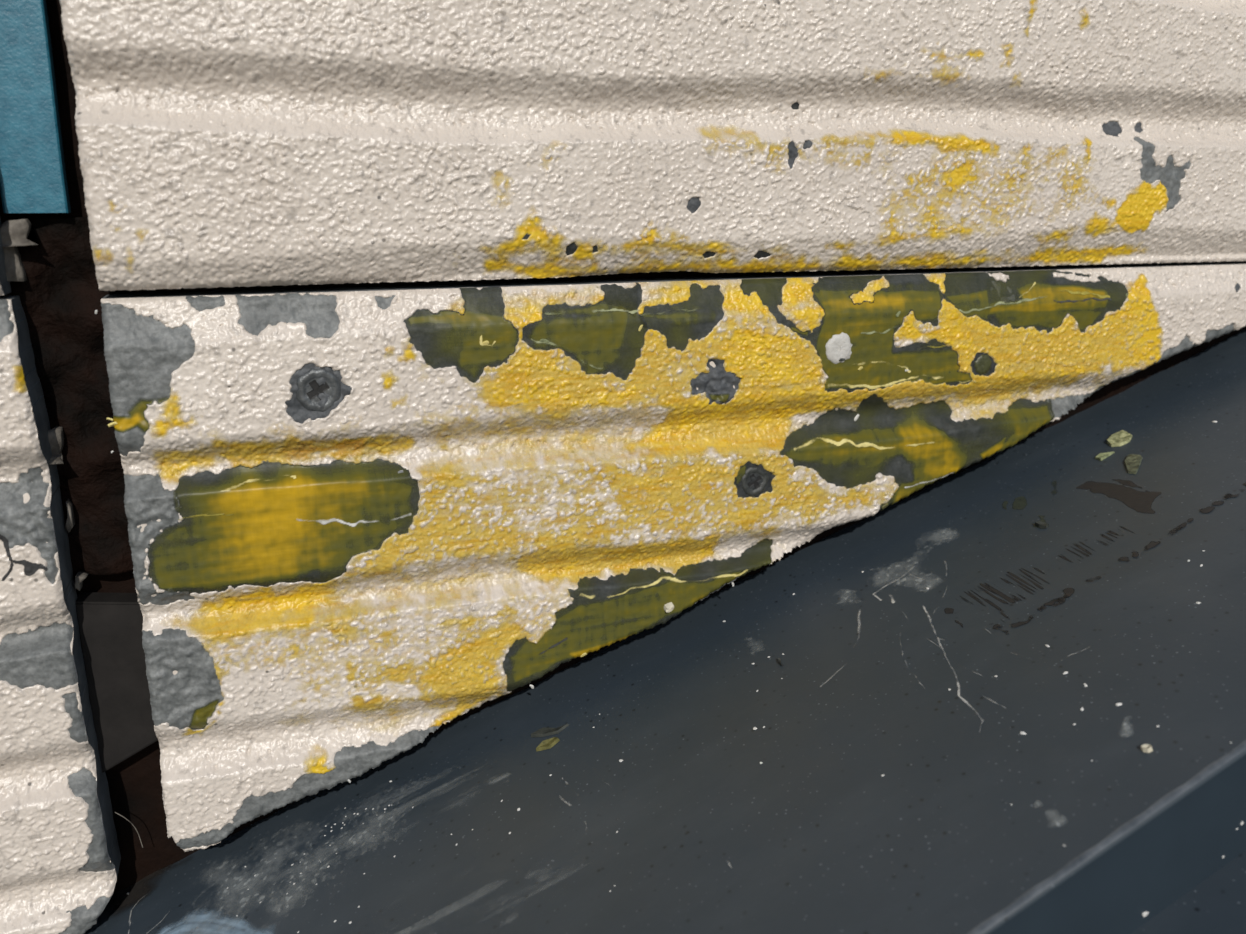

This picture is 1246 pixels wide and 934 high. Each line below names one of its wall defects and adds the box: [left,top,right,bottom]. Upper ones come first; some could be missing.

peeling [1102,121,1191,212]
peeling [95,303,195,456]
peeling [186,293,340,339]
peeling [404,282,725,383]
peeling [690,359,740,404]
peeling [740,270,1241,511]
peeling [0,467,59,584]
peeling [124,458,420,605]
peeling [503,538,773,692]
peeling [0,622,88,743]
peeling [142,626,224,730]
peeling [68,767,115,872]